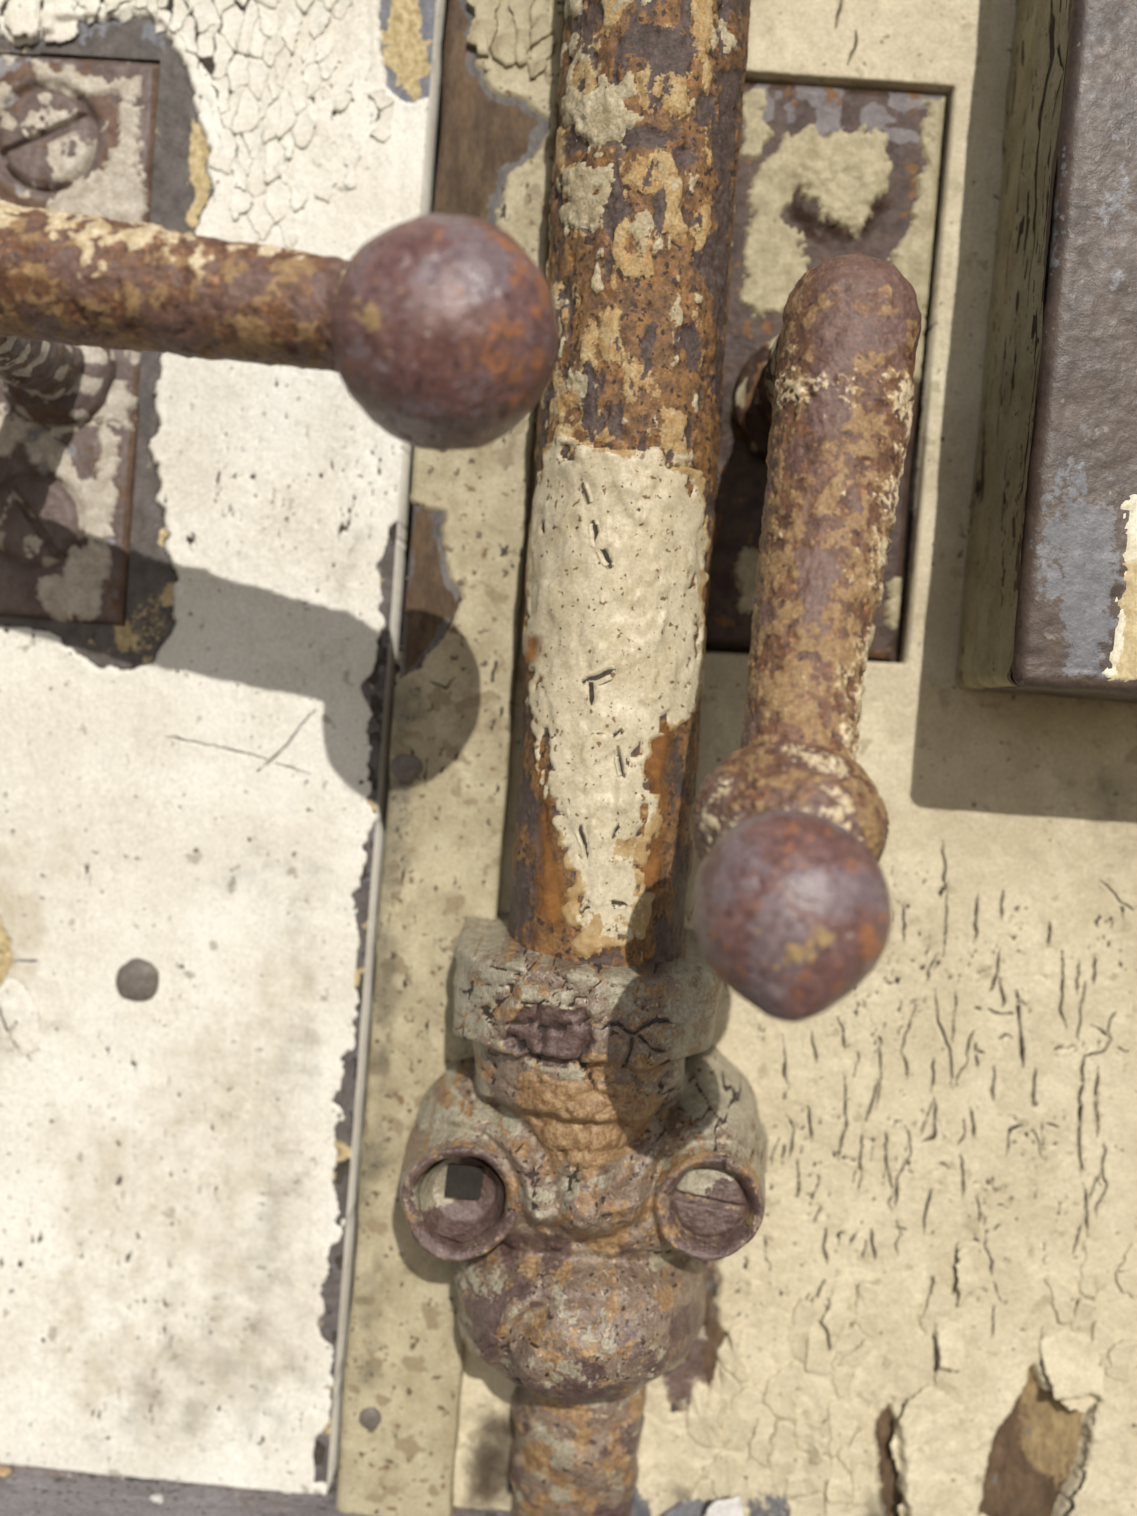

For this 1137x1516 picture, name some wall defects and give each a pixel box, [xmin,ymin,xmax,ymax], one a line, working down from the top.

crack [0,0,394,249]
peeling [378,0,644,236]
crack [467,0,557,80]
peeling [1102,494,1137,682]
rust [537,803,564,926]
peeling [522,424,711,957]
rust [641,835,661,888]
rust [645,726,670,815]
crack [683,839,1137,1516]
peeling [934,1247,985,1372]
rust [471,1419,515,1502]
peeling [875,1328,1137,1516]